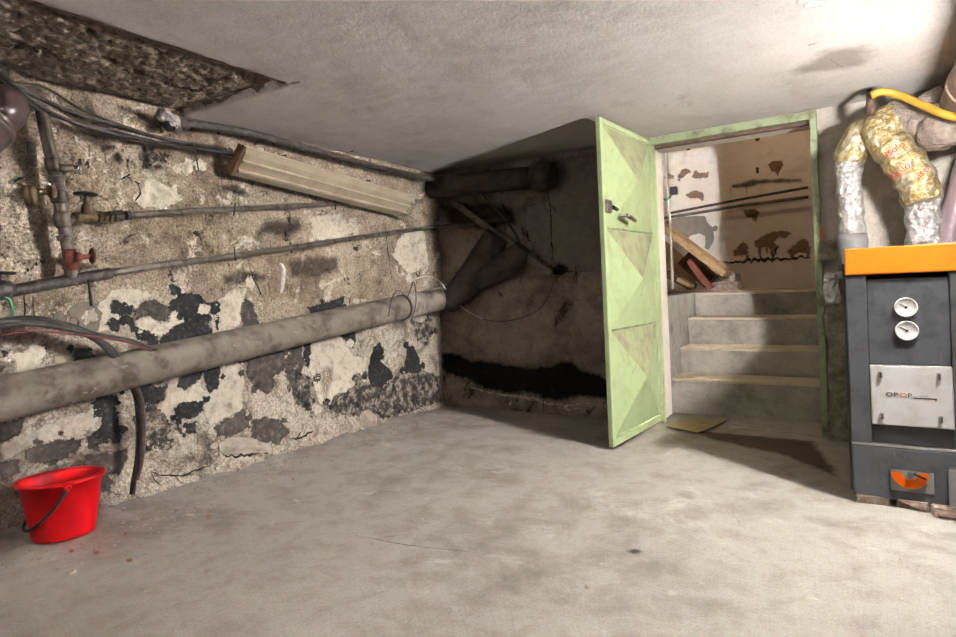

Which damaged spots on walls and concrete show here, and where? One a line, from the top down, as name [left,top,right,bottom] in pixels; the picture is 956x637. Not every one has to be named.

spalling [0,0,286,112]
peeling [132,154,207,209]
peeling [307,212,360,242]
peeling [392,230,429,283]
peeling [67,283,184,352]
peeling [197,275,261,333]
peeling [11,334,47,373]
peeling [145,336,384,453]
peeling [0,408,135,493]